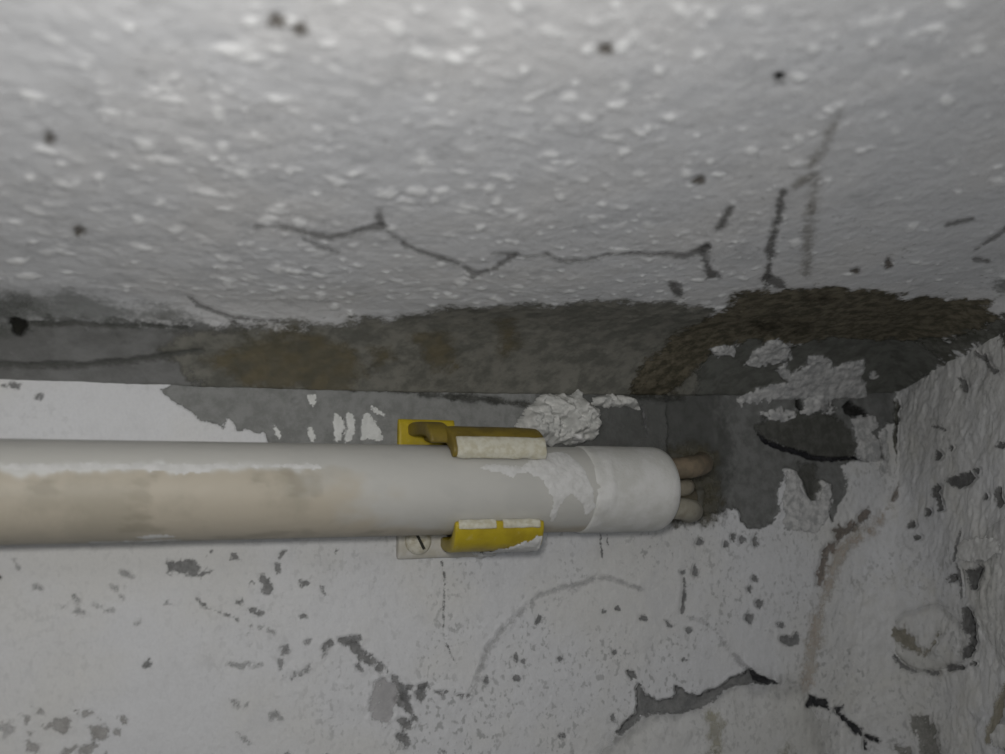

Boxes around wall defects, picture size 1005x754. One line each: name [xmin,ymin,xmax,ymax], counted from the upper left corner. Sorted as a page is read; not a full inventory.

crack [254,209,710,278]
leakage [0,190,1005,396]
peeling [160,384,555,444]
peeling [546,392,901,547]
peeling [925,468,980,516]
peeling [166,559,212,576]
peeling [250,551,286,594]
peeling [745,576,763,624]
peeling [777,622,799,647]
crack [322,634,470,748]
peeling [46,709,127,754]
crack [806,695,879,750]